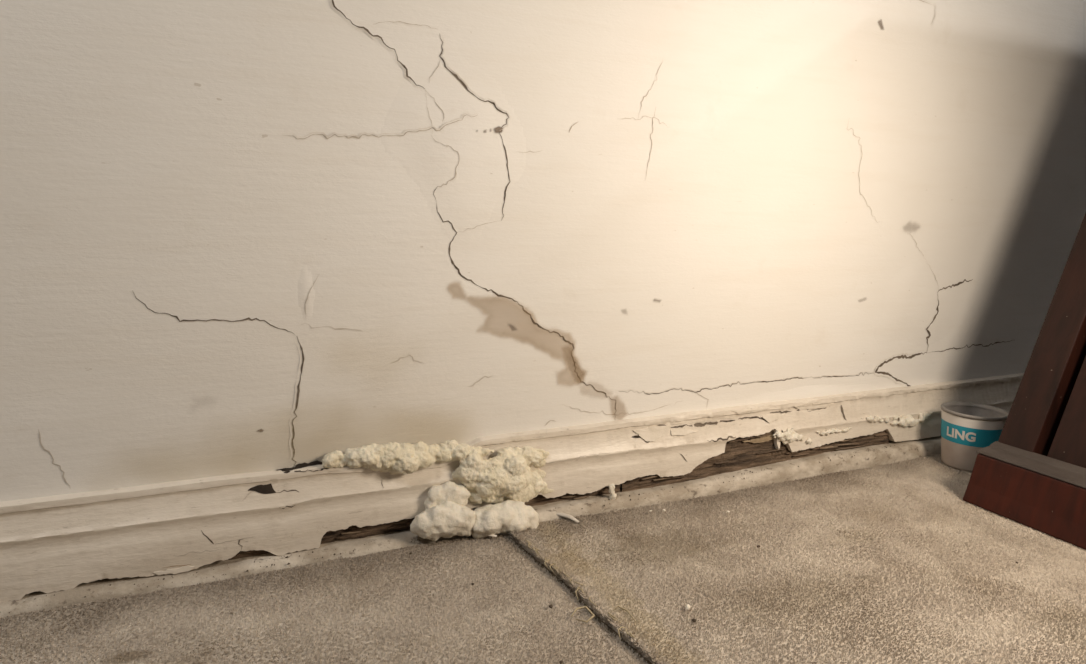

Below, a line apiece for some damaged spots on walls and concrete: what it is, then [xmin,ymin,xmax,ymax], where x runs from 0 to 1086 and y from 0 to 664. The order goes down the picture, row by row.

crack [284,0,1012,442]
crack [133,276,361,465]
peeling [732,403,833,443]